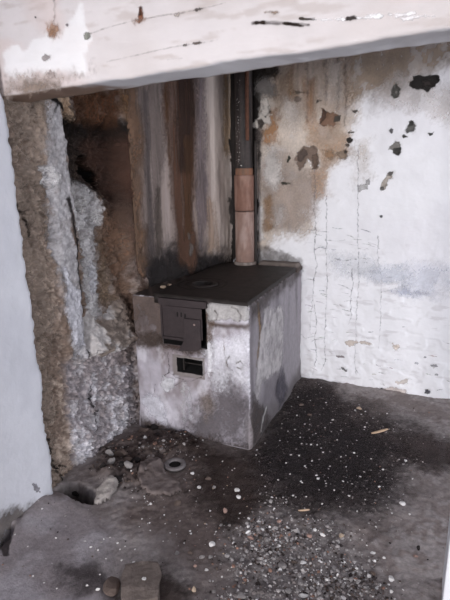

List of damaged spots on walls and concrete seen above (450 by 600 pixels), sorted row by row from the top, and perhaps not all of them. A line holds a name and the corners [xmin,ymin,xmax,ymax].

flaking render [5,97,105,370]
damp [127,88,162,279]
damp [177,78,194,236]
flaking render [287,132,354,170]
flaking render [317,100,341,127]
damp [257,42,450,250]
flaking render [389,120,416,156]
flaking render [409,75,440,92]
flaking render [41,376,61,490]